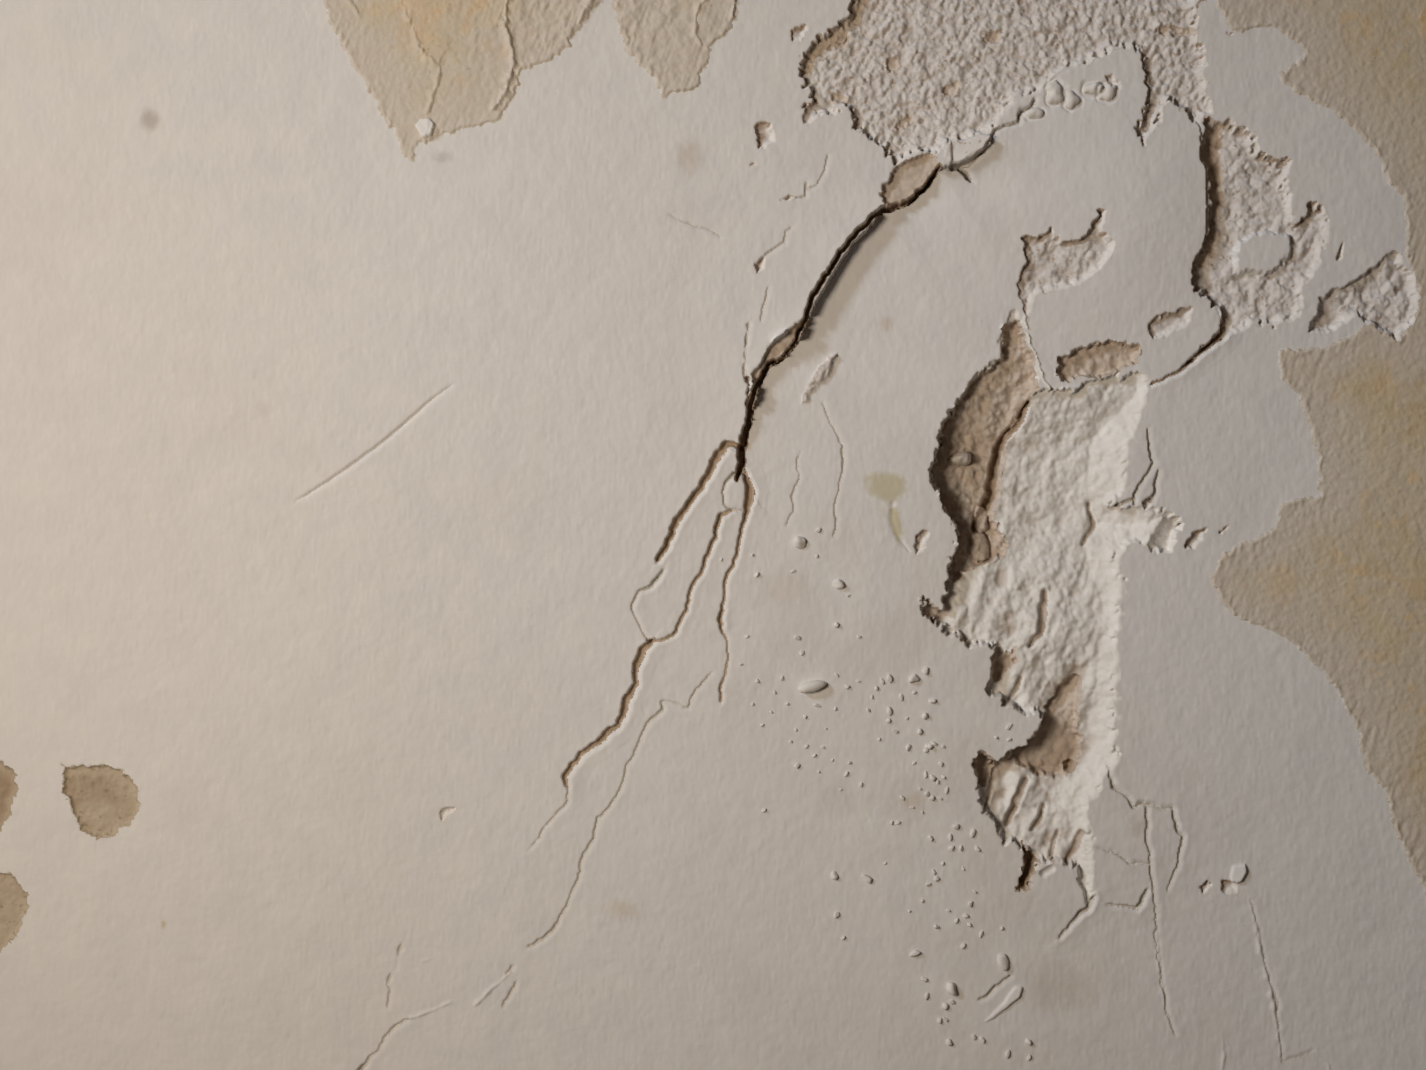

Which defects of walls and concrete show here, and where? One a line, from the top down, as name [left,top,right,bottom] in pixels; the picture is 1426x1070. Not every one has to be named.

crack [358,943,410,1070]
crack [503,99,1037,1008]
spalling [791,0,1421,906]